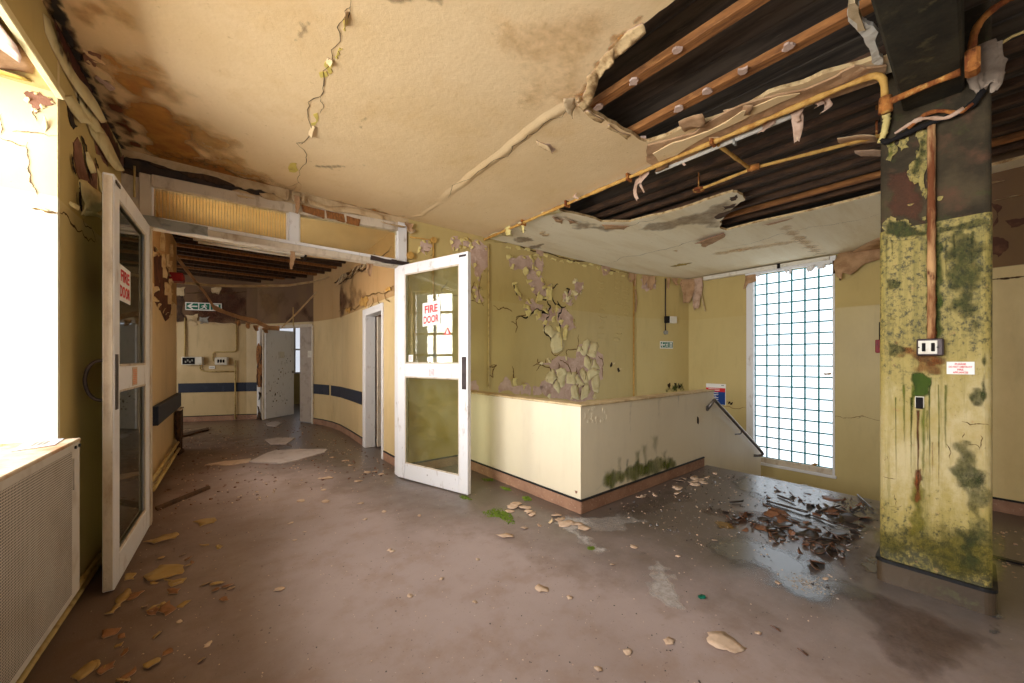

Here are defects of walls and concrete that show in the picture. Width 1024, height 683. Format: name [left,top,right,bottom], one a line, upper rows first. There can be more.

crack [0,111,54,198]
leakage [46,0,275,197]
peeling [23,90,432,256]
crack [288,3,351,192]
spalling [563,23,646,139]
peeling [633,0,887,201]
peeling [882,130,1024,257]
peeling [153,232,247,327]
peeling [450,222,627,402]
leakage [947,232,983,323]
leakage [970,382,986,406]
leakage [952,441,990,509]